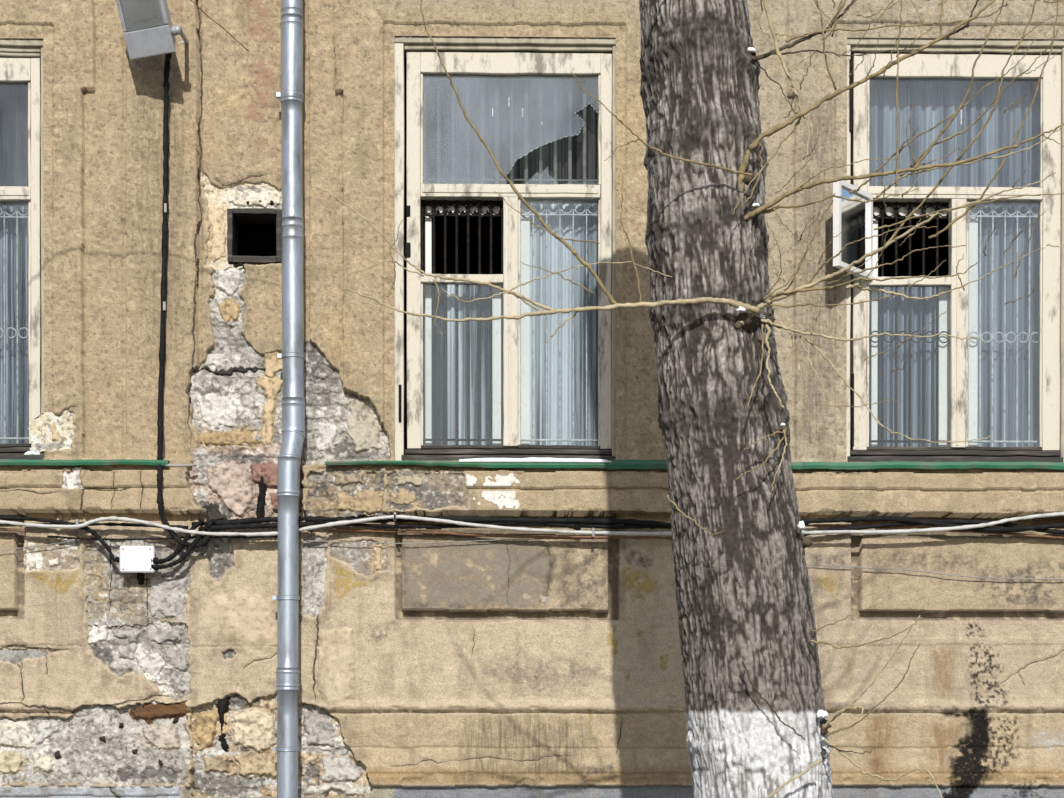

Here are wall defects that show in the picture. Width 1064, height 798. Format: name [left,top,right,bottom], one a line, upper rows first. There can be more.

crack [187,0,266,445]
flaking render [0,171,283,798]
flaking render [299,340,520,617]
crack [0,644,191,717]
flaking render [298,703,373,798]
leakage [943,647,1016,798]